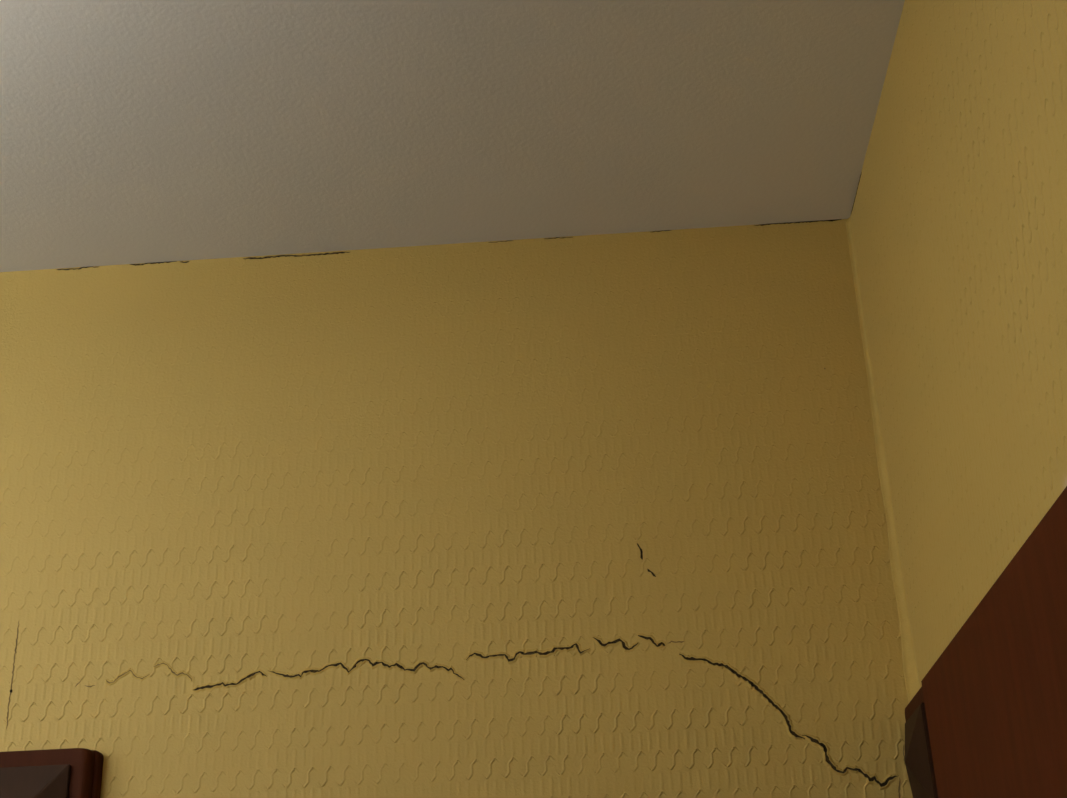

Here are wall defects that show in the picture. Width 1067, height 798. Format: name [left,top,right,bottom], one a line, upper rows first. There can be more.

crack [637,543,656,577]
crack [6,621,19,729]
crack [75,633,899,790]